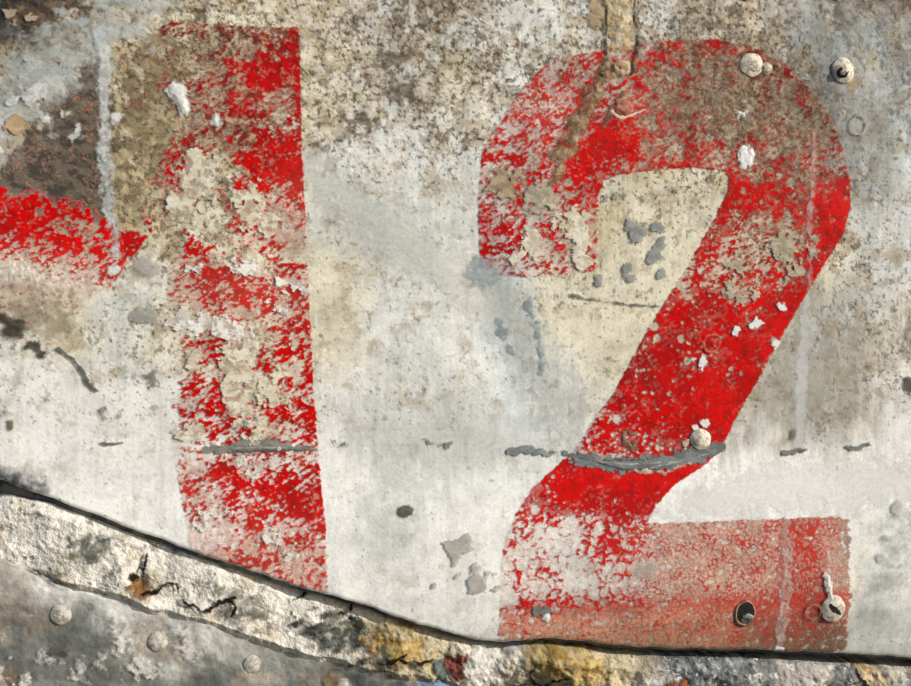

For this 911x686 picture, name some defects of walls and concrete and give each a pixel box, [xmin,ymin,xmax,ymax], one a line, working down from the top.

peeling [2,8,38,26]
peeling [166,147,226,229]
peeling [230,178,285,238]
peeling [228,254,313,318]
peeling [625,218,666,280]
peeling [722,260,761,305]
peeling [765,230,821,284]
peeling [732,316,764,336]
peeling [165,306,293,486]
peeling [683,419,710,448]
corrosion [128,572,152,600]
crack [141,553,237,618]